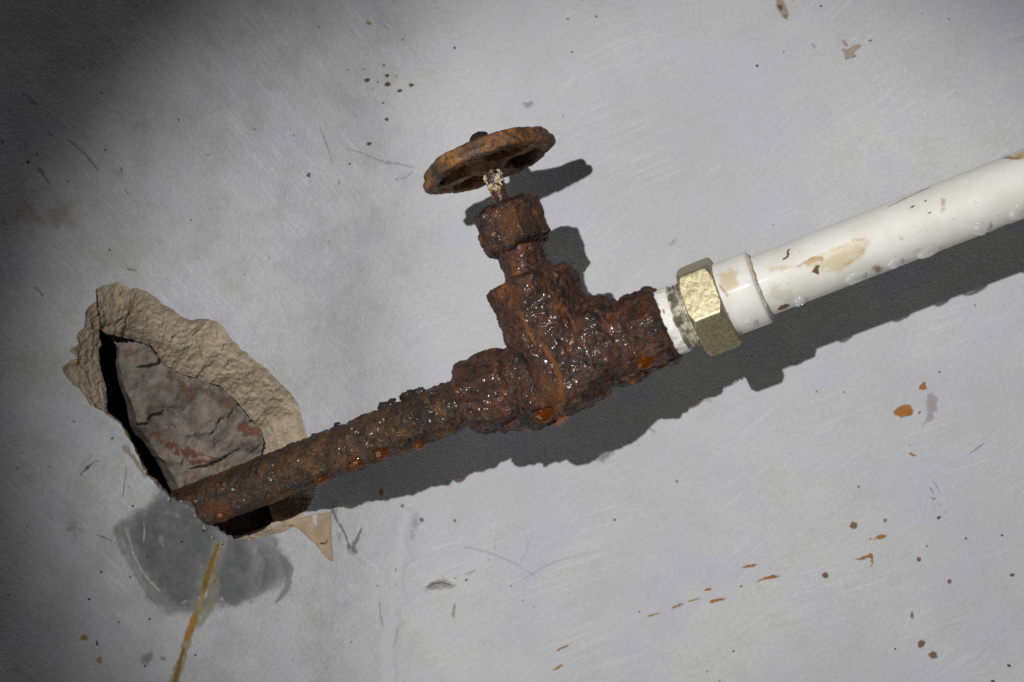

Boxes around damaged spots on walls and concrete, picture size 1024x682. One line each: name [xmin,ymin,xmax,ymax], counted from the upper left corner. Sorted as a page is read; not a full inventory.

spalling [62,282,333,561]
rust [894,405,921,417]
water stain [138,502,214,602]
rust [169,542,222,682]